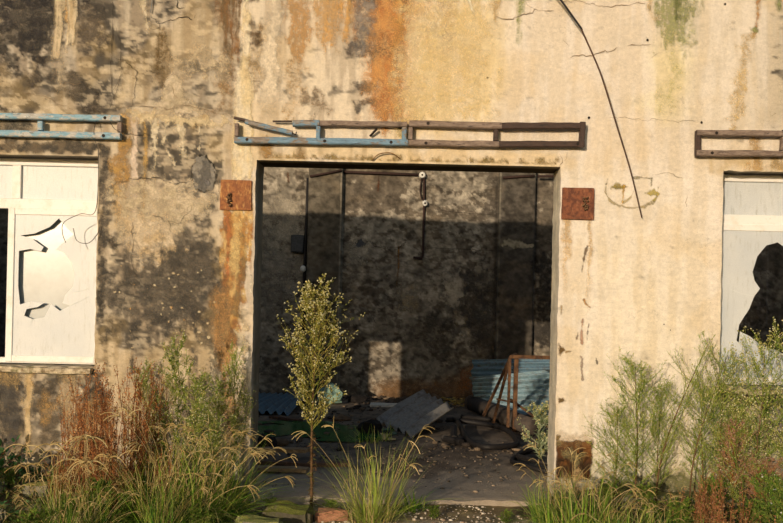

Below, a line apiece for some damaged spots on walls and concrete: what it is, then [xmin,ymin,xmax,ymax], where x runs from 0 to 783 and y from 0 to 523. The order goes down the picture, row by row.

leakage [0,107,101,155]
leakage [0,0,111,114]
crack [110,2,227,115]
spalling [191,154,217,193]
leakage [212,0,490,180]
corrosion [364,0,421,134]
corrosion [732,0,761,130]
leakage [96,231,234,360]
corrosion [210,208,253,445]
leakage [0,363,118,474]
corrosion [555,440,593,492]